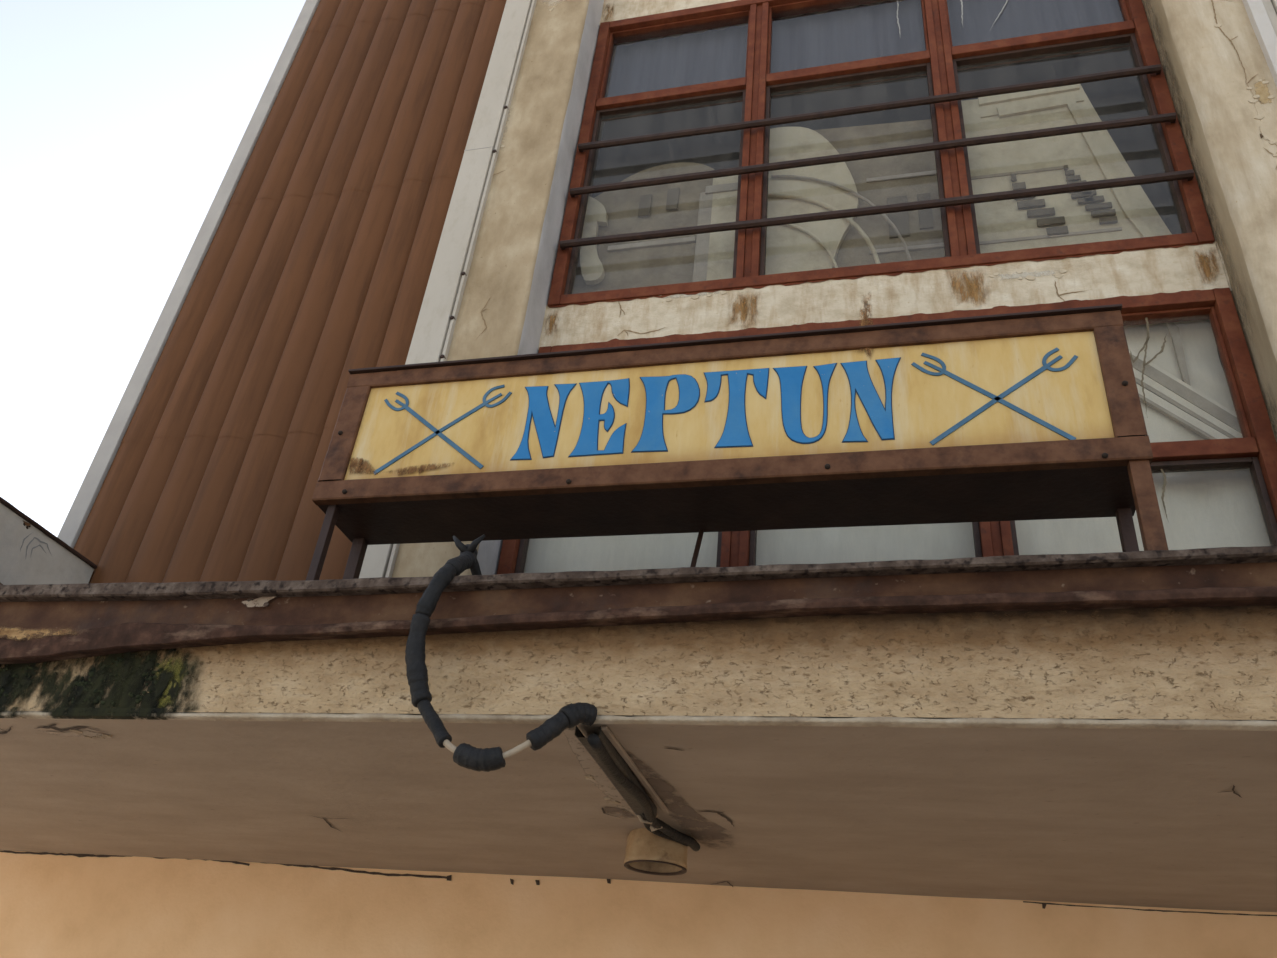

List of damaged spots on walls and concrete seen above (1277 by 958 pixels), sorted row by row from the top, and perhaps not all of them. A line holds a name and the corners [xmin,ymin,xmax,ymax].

crack [1211,0,1277,170]
rust [1196,251,1218,282]
rust [952,273,984,303]
rust [732,297,757,325]
crack [0,724,107,734]